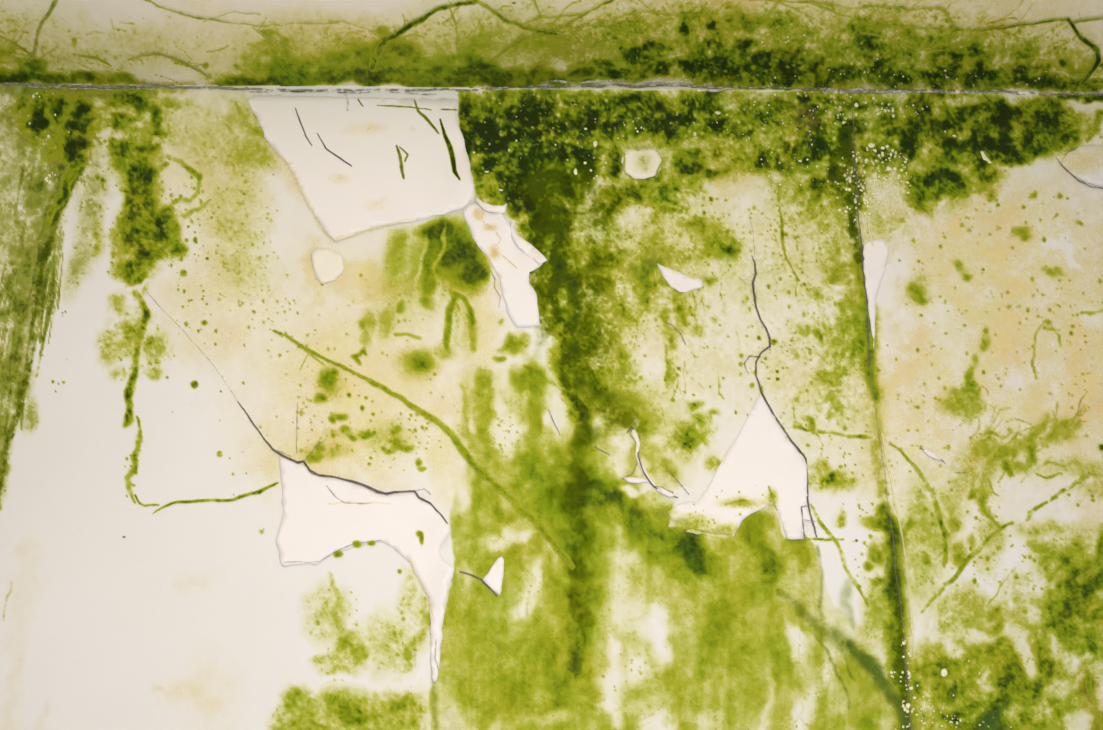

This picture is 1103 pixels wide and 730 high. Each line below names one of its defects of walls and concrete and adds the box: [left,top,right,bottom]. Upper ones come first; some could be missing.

damp [0,29,279,512]
crack [237,401,448,524]
damp [274,689,423,730]
peeling [276,456,455,682]
peeling [247,94,547,327]
damp [312,217,490,380]
peeling [482,556,504,595]
crack [0,80,1103,366]
peeling [623,393,812,540]
crack [739,256,817,538]
crack [881,433,915,677]
damp [810,501,1103,730]